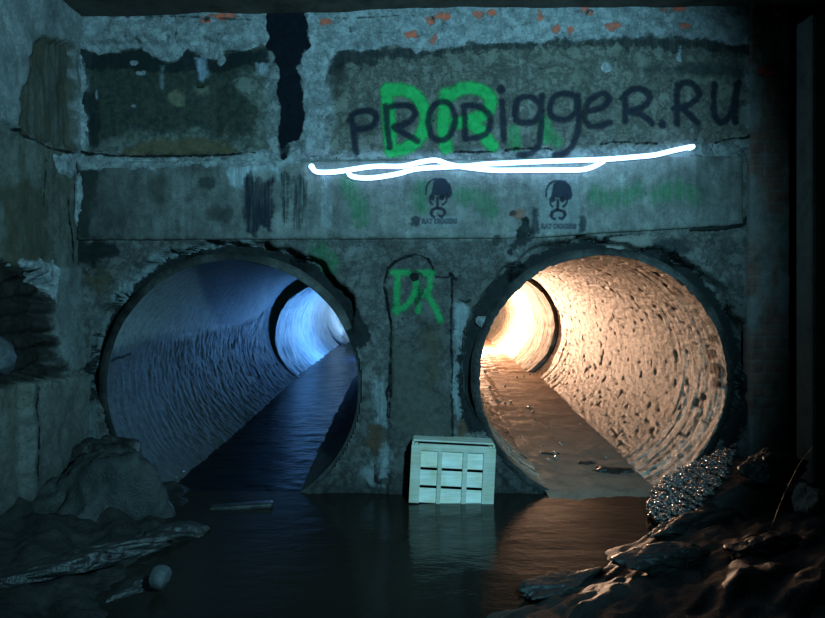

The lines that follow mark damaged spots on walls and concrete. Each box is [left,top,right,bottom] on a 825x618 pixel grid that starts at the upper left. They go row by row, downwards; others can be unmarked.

peeling [53,6,750,230]
water stain [78,169,120,267]
water stain [111,144,307,304]